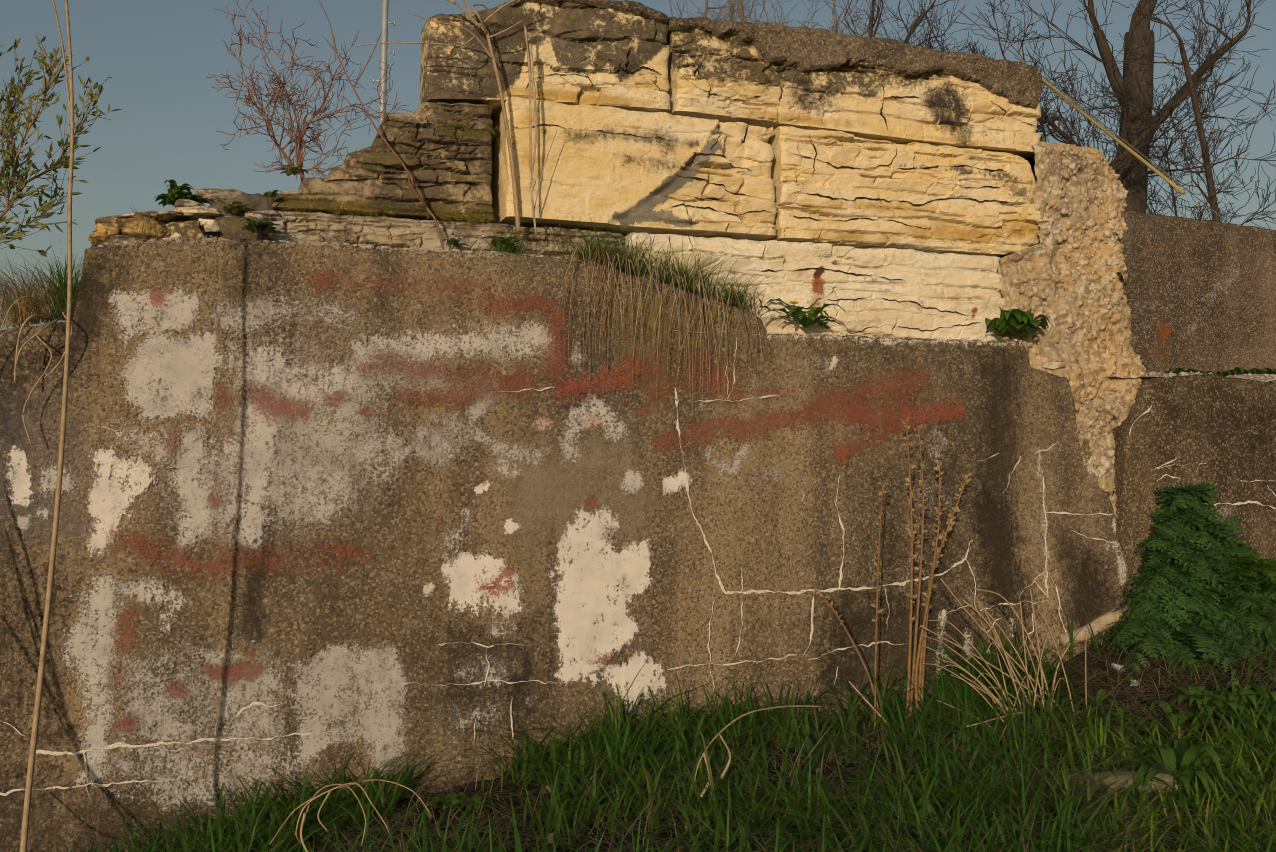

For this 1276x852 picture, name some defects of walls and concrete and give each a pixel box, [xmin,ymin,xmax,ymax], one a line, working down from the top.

corrosion [812,266,825,307]
crack [668,268,1117,690]
spalling [1075,447,1107,478]
crack [1151,456,1206,481]
crack [1204,479,1276,509]
spalling [1105,498,1128,586]
crack [0,702,354,798]